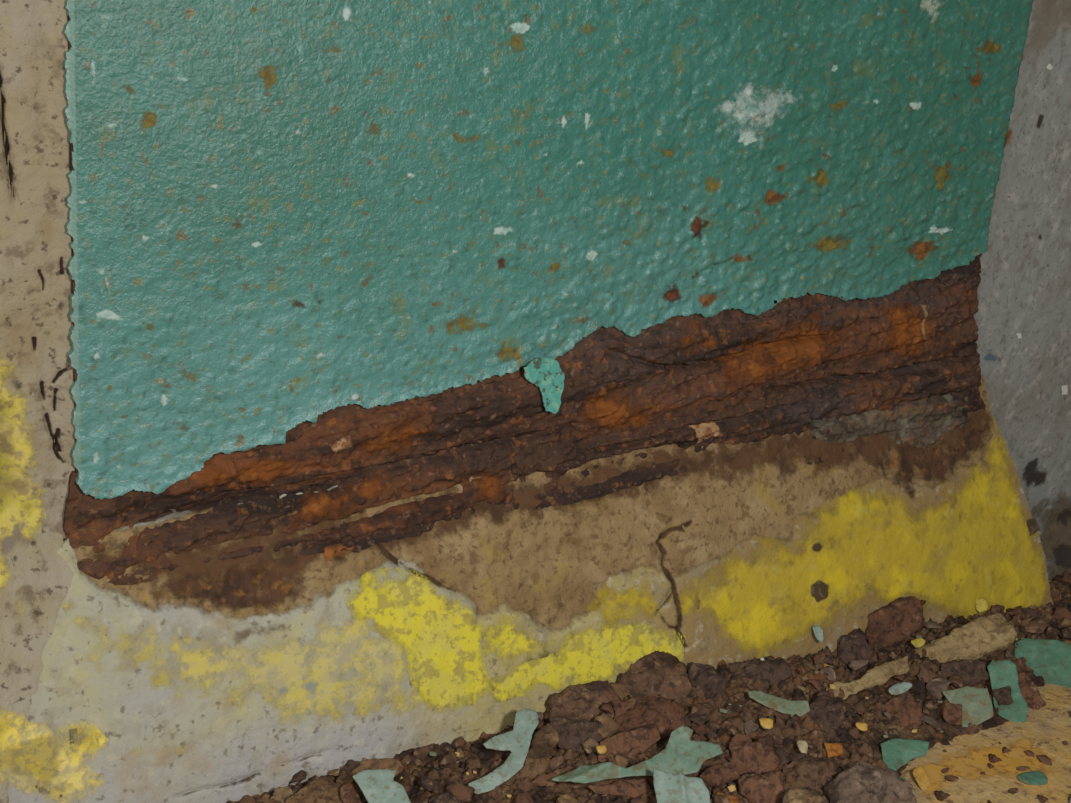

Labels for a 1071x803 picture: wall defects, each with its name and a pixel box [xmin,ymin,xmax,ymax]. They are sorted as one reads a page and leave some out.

crack [0,73,14,197]
peeling [0,361,46,587]
corrosion [63,253,992,608]
spalling [64,375,1047,728]
crack [656,520,692,648]
peeling [0,713,109,803]
peeling [759,718,773,730]
peeling [796,740,808,754]
peeling [900,738,1053,803]